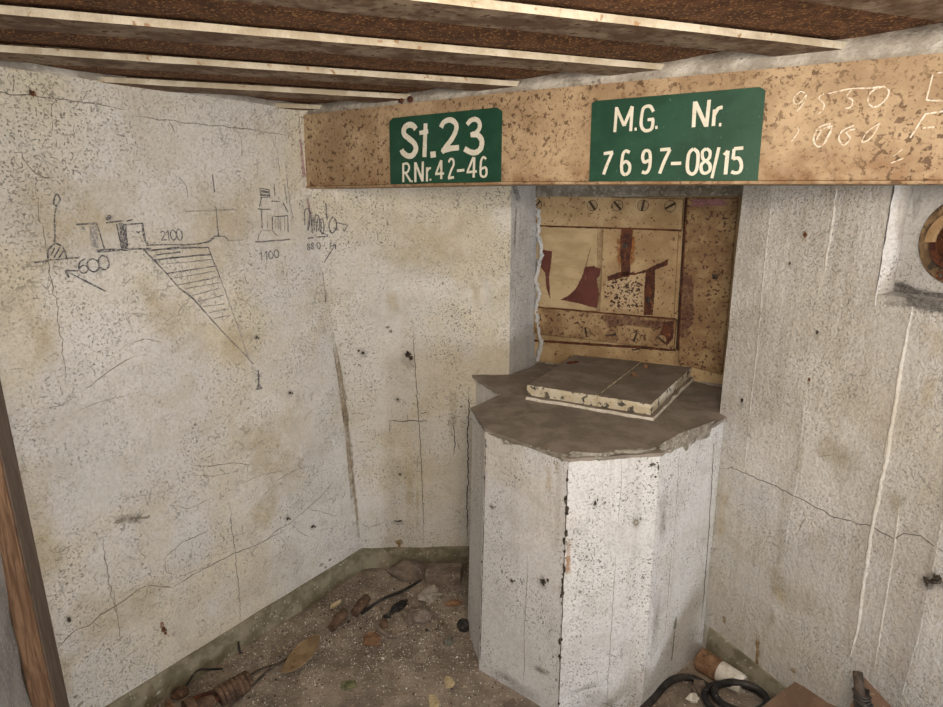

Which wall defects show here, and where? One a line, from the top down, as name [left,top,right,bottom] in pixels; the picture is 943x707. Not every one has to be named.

corrosion [604,229,674,347]
crack [61,462,334,645]
spalling [479,421,715,706]
crack [702,445,943,609]